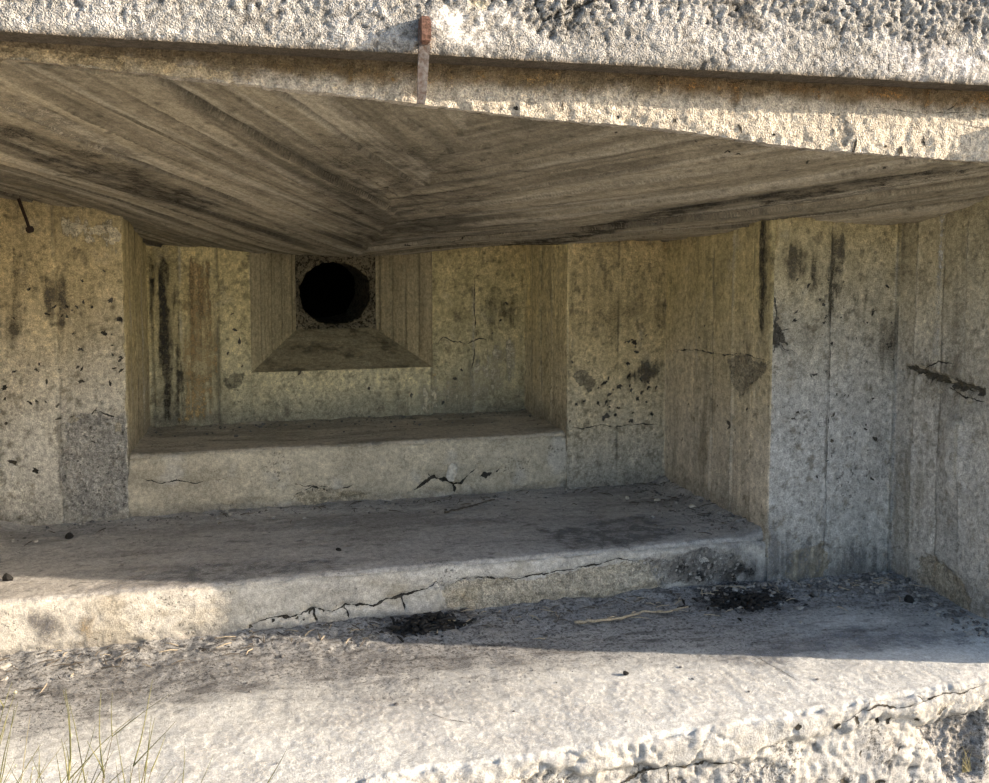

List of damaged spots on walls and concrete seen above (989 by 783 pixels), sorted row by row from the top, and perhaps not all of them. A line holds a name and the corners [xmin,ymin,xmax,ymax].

crack [914,361,983,402]
crack [414,469,499,492]
crack [254,558,645,624]
spalling [917,554,972,612]
crack [843,685,982,722]